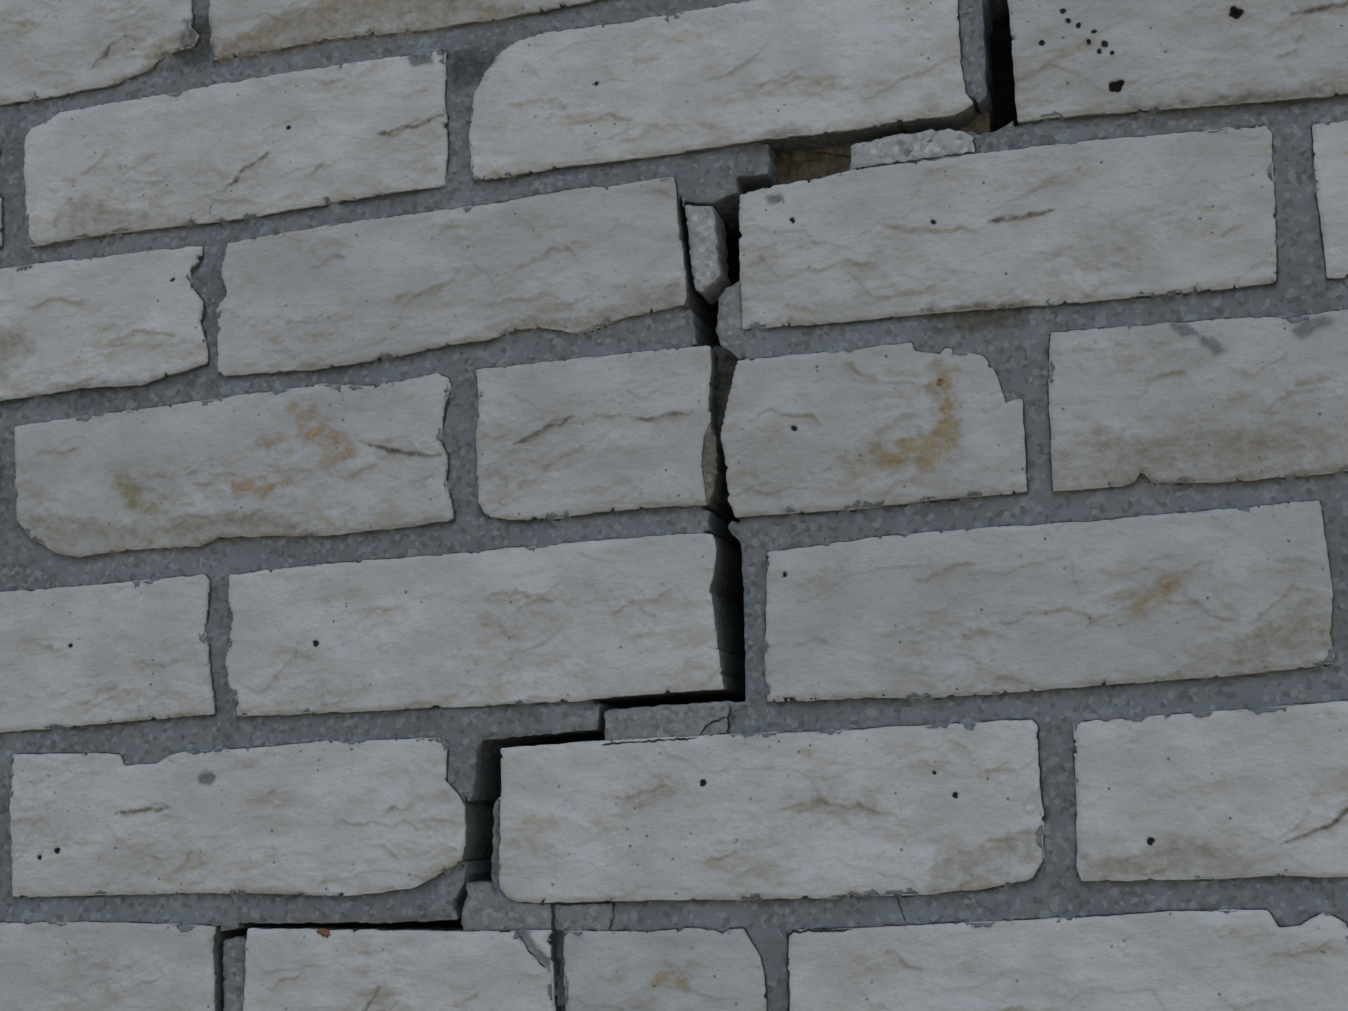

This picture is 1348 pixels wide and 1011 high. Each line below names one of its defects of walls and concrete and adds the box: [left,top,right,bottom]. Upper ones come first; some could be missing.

crack [776,15,1018,185]
crack [712,231,742,435]
crack [729,512,746,659]
crack [520,696,746,746]
crack [374,917,462,925]
crack [519,901,615,967]
crack [786,929,852,1011]